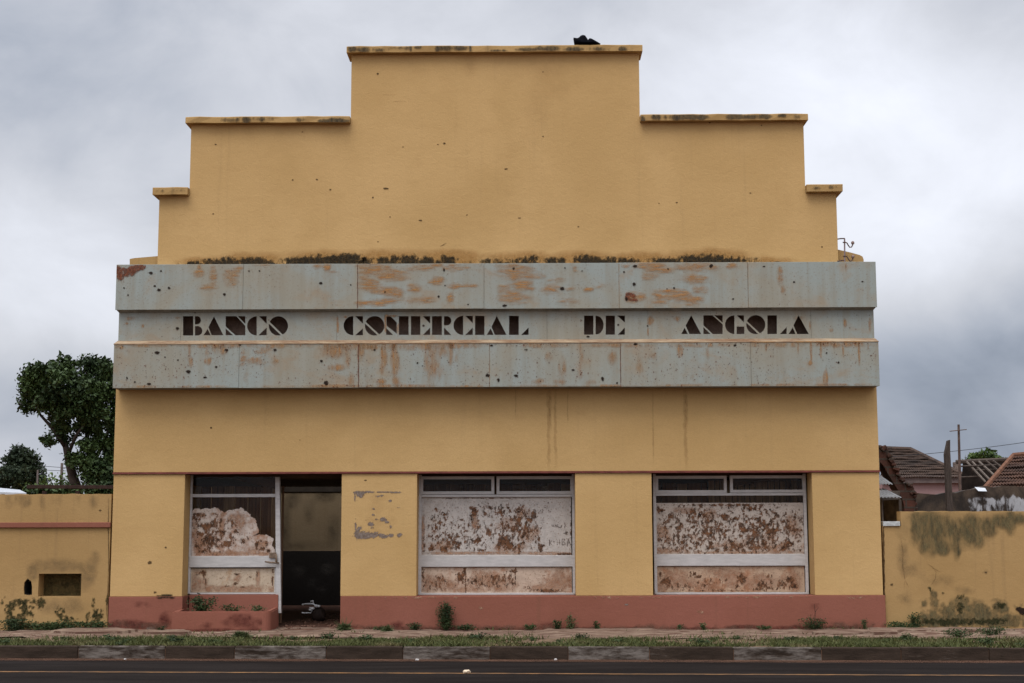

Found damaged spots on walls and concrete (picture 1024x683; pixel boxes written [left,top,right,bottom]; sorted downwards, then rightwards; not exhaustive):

water stain [187,250,775,264]
peeling [192,513,270,555]
peeling [353,480,402,539]
peeling [423,498,551,554]
peeling [657,503,804,554]
water stain [911,512,1024,556]
peeling [415,568,562,598]
peeling [659,571,798,598]